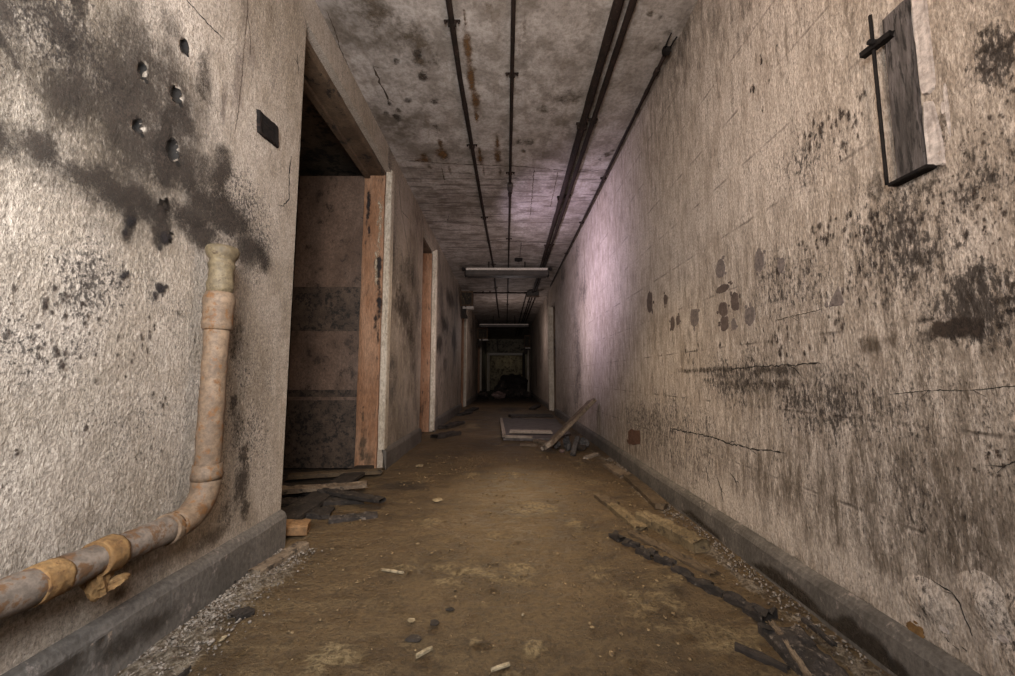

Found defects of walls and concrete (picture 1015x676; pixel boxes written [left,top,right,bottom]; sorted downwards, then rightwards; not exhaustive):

crack [234,0,251,134]
rust [463,34,480,121]
leakage [0,0,269,271]
leakage [804,90,866,160]
leakage [798,174,929,299]
leakage [42,285,101,335]
leakage [153,282,168,300]
leakage [919,316,985,342]
crack [729,362,823,376]
crack [895,386,1015,398]
crack [670,428,782,455]
leakage [754,564,909,676]